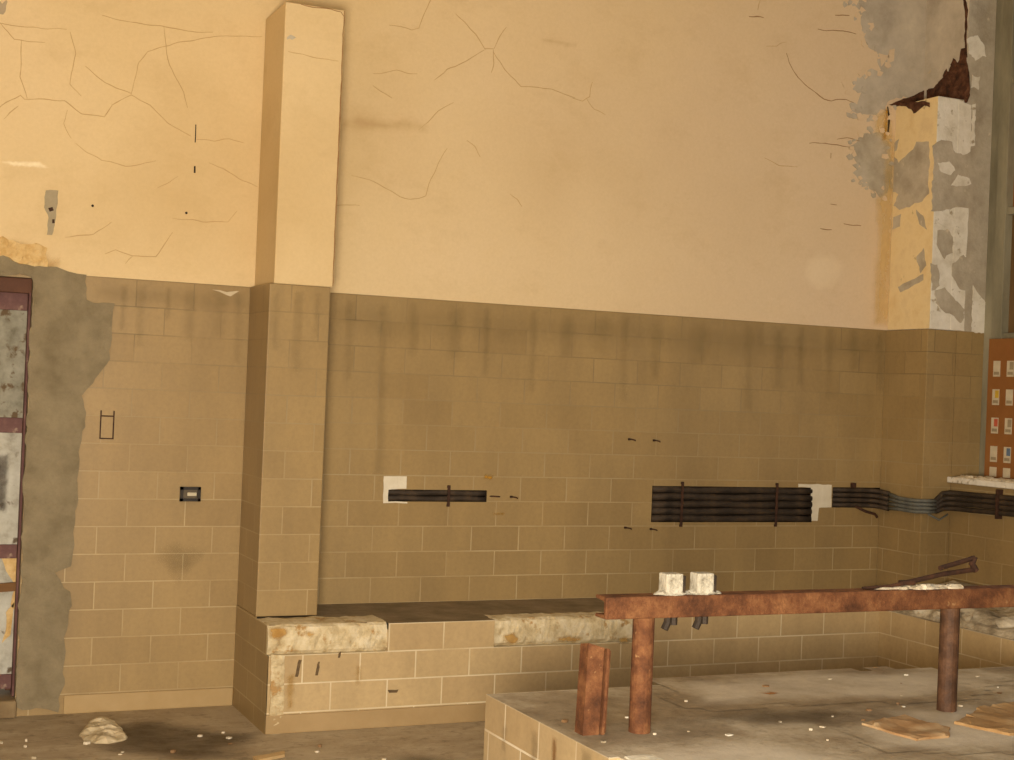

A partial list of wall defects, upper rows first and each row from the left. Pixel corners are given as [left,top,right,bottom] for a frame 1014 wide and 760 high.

crack [0,15,257,187]
crack [288,4,480,284]
crack [436,14,605,115]
crack [777,42,854,103]
peeling [841,0,985,333]
flaking render [0,236,48,267]
crack [70,211,237,264]
spalling [257,615,387,726]
spalling [485,611,633,646]